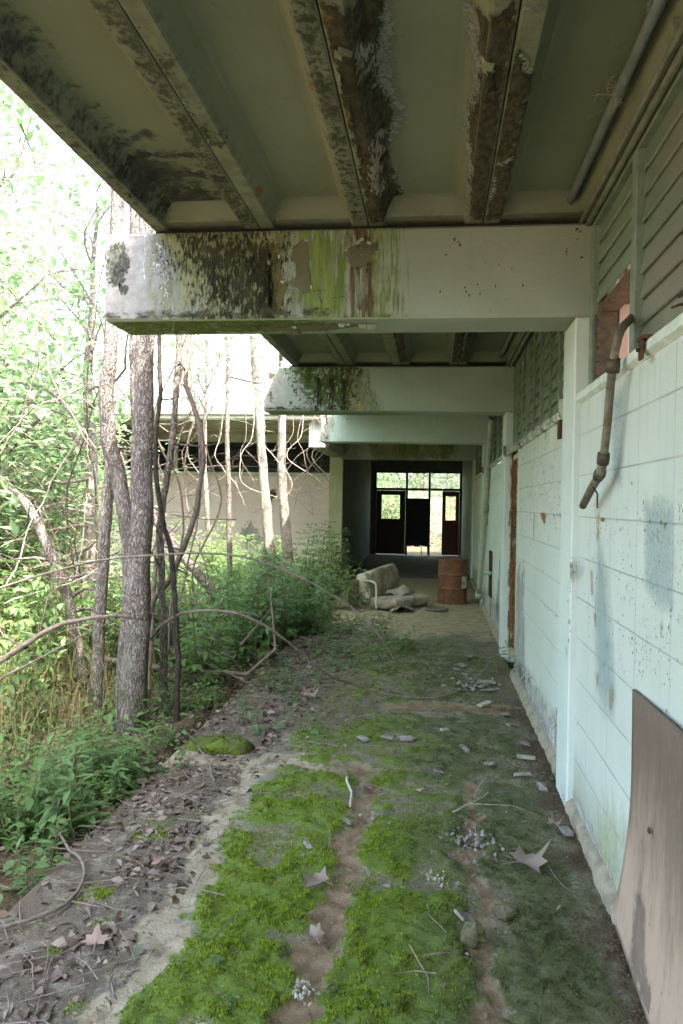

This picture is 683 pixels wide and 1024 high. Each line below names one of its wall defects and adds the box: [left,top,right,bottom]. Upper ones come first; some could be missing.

mould [0,15,59,111]
spalling [334,46,364,123]
spalling [479,53,498,94]
water stain [57,0,328,319]
peeling [267,239,312,314]
corrosion [350,262,373,317]
corrosion [507,451,518,649]